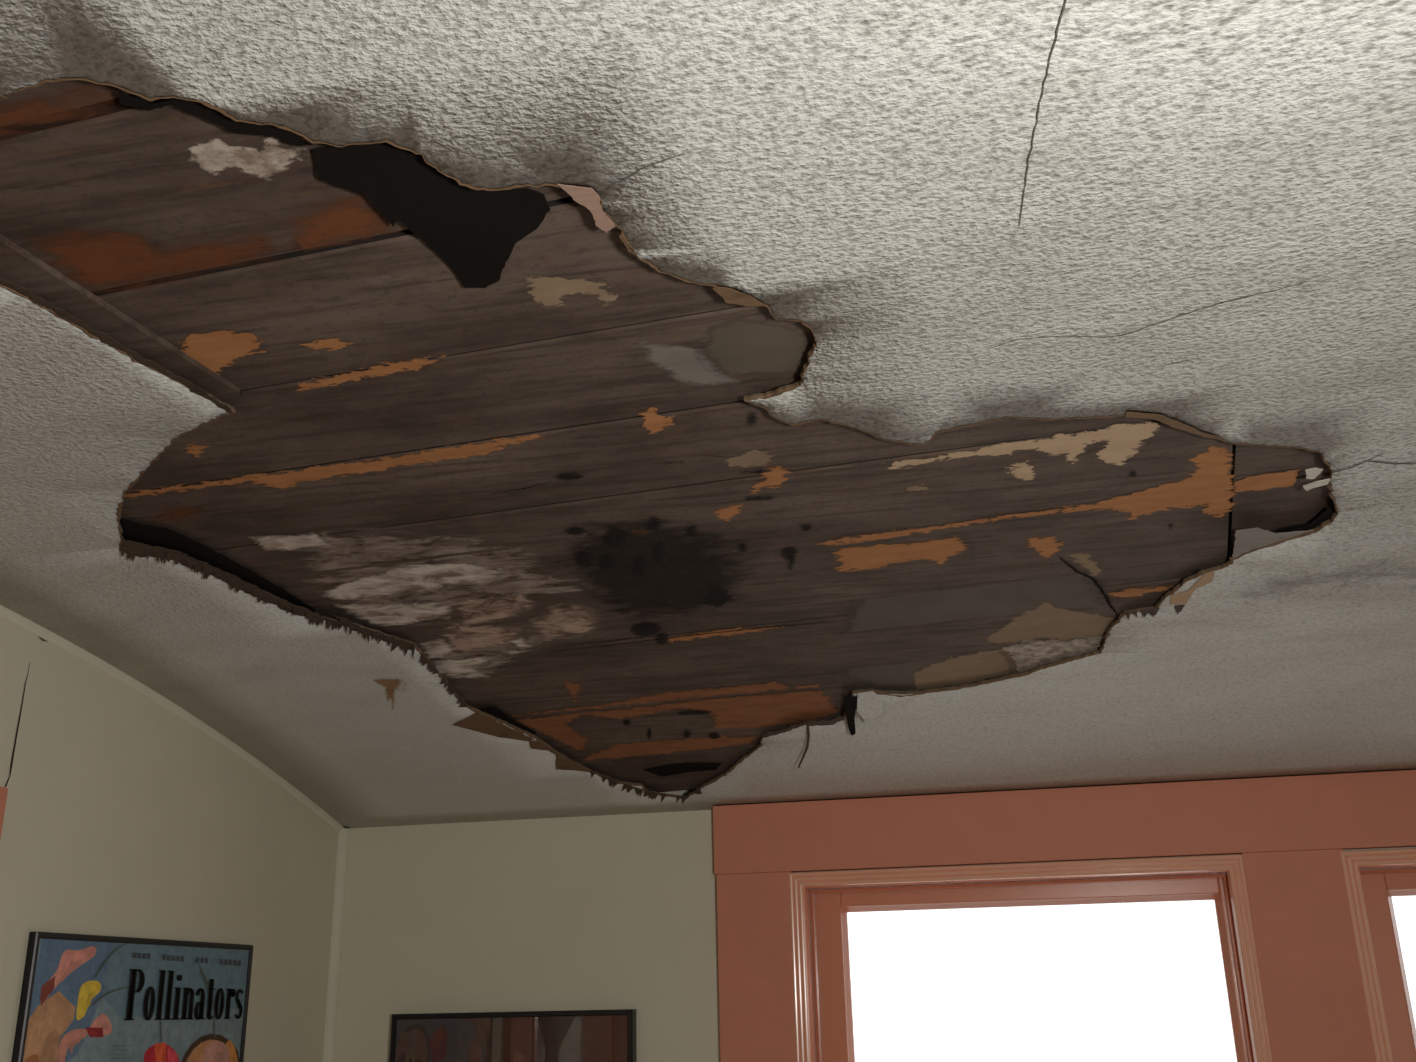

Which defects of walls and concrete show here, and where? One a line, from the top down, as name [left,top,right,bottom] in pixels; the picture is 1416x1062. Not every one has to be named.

crack [1019,0,1067,226]
peeling [0,78,1339,804]
crack [1332,452,1416,473]
damp [253,518,746,678]